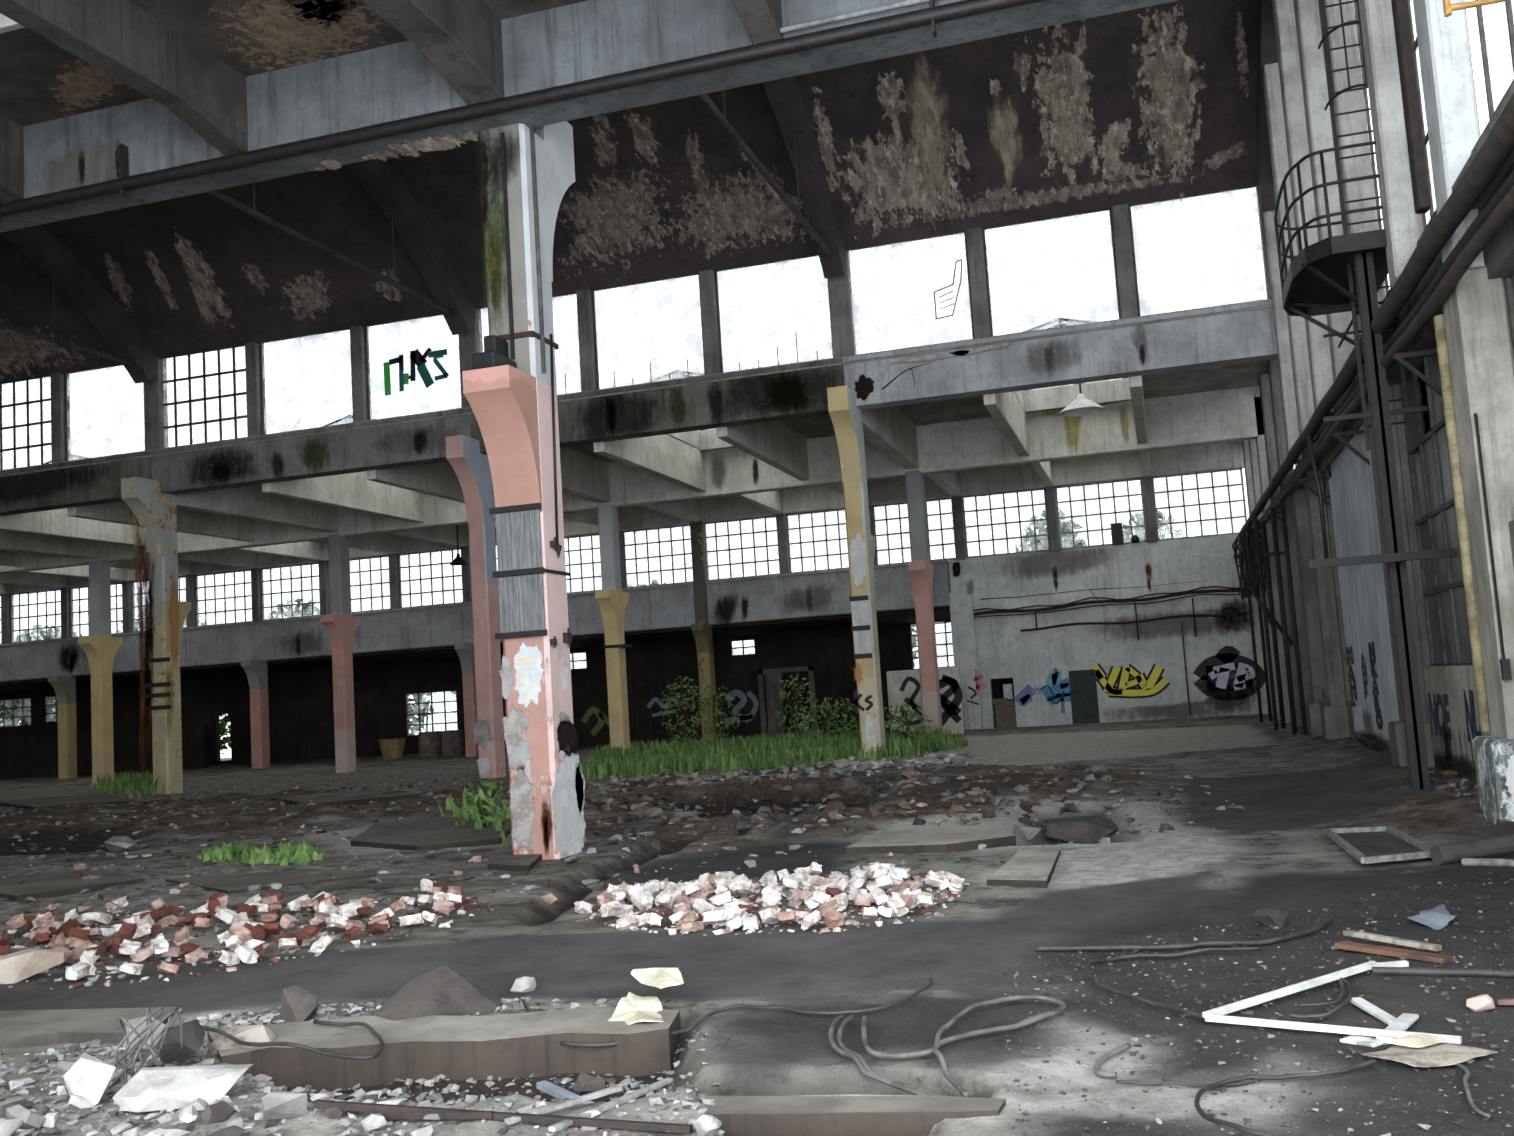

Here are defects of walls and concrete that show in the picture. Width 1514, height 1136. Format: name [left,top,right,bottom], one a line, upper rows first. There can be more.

peeling [812,2,1250,240]
peeling [556,109,814,283]
peeling [0,315,101,383]
water stain [577,387,685,440]
water stain [708,369,838,424]
corrosion [132,513,179,767]
peeling [472,643,569,851]
peeling [552,712,586,856]
peeling [1504,755,1514,804]